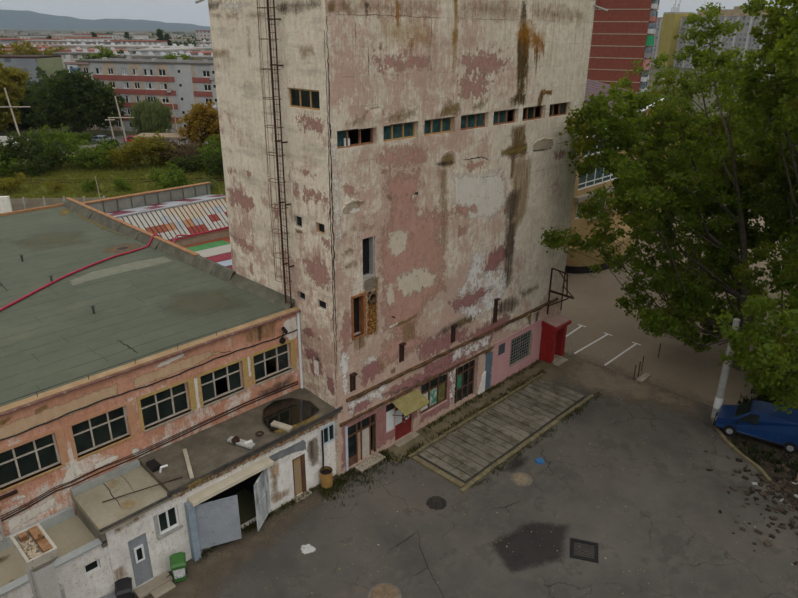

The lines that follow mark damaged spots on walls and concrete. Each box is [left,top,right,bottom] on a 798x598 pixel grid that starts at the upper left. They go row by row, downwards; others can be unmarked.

peeling [371,46,432,84]
peeling [453,47,511,108]
corrosion [511,1,544,104]
peeling [294,111,323,133]
flaking render [533,138,566,159]
peeling [228,187,254,213]
flaking render [293,145,364,250]
leakage [504,158,531,284]
flaking render [283,315,320,340]
peeling [302,144,510,471]